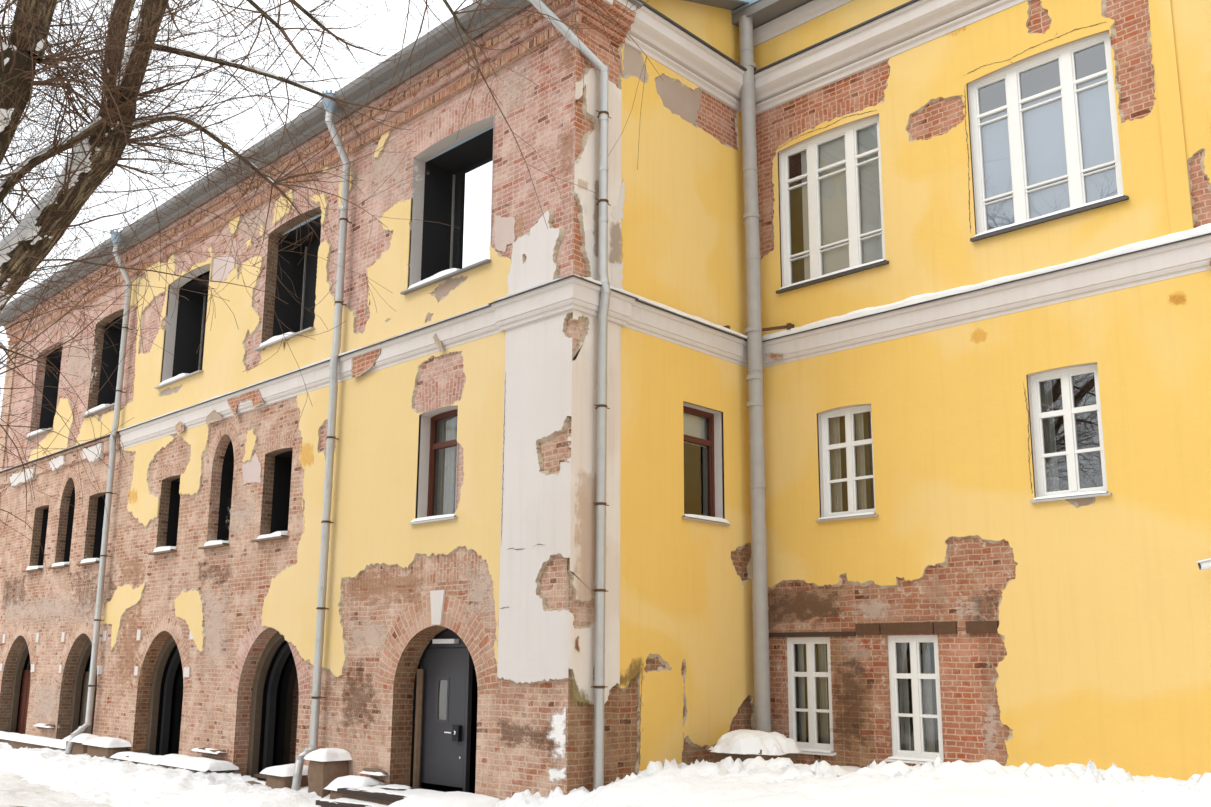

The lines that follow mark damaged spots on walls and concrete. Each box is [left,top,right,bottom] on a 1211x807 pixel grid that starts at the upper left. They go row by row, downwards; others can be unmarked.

flaking render [161,21,739,372]
flaking render [756,60,891,259]
flaking render [906,95,965,142]
flaking render [1101,0,1156,123]
flaking render [1187,148,1211,228]
flaking render [4,271,166,469]
flaking render [536,416,571,476]
flaking render [0,397,305,763]
flaking render [295,546,499,784]
flaking render [535,553,595,629]
flaking render [475,653,716,801]
flaking render [768,535,1018,768]